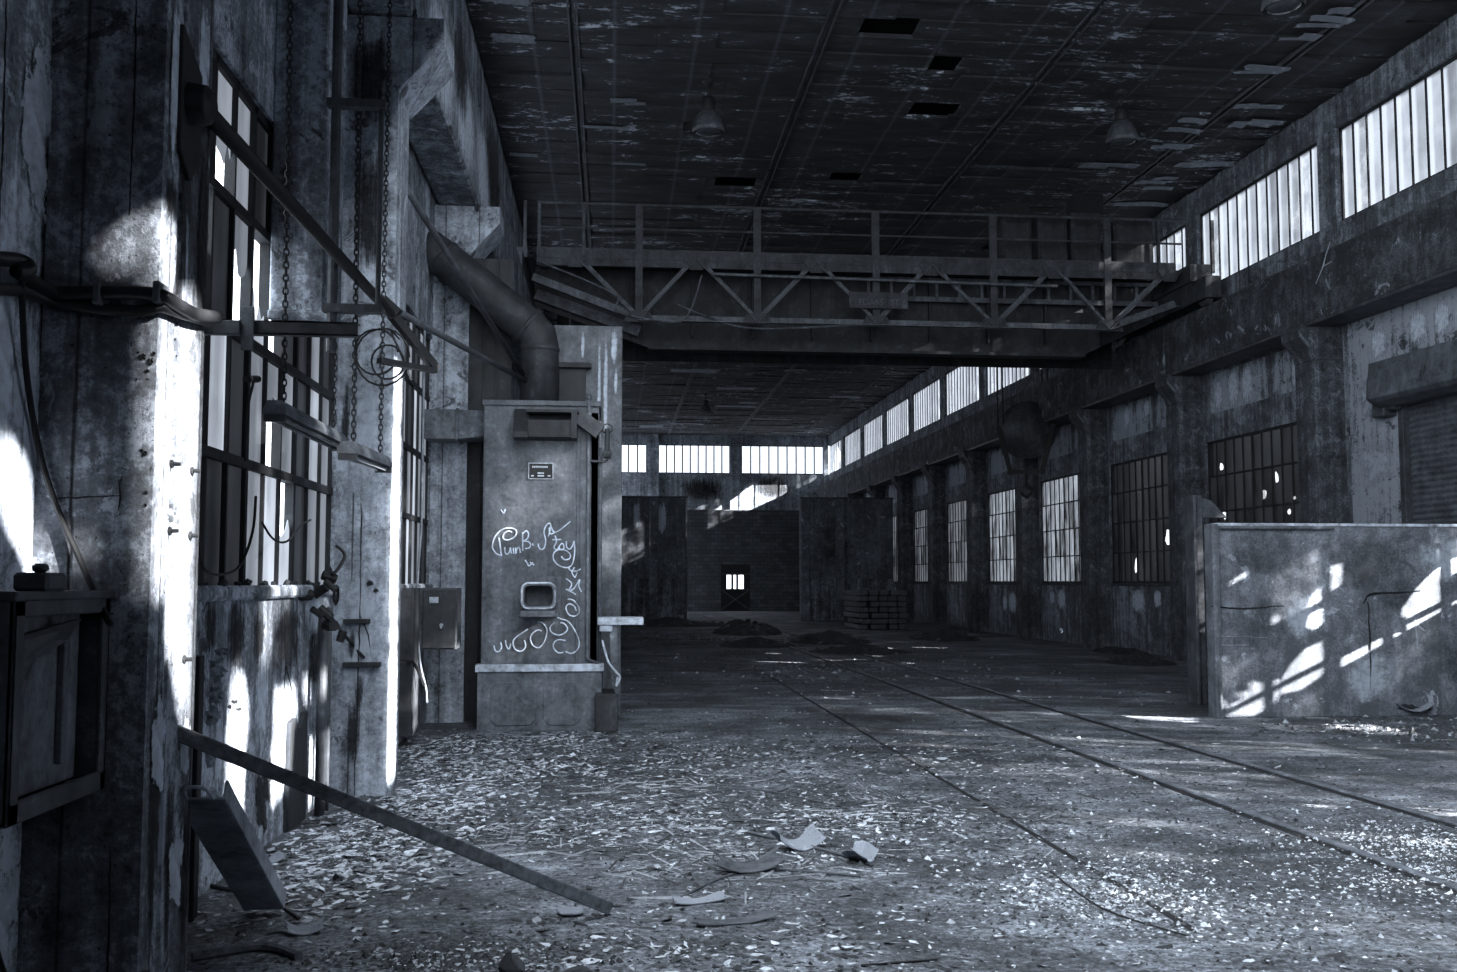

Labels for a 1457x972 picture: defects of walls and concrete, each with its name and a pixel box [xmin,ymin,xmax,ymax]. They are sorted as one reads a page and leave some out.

peeling [491,33,536,44]
water stain [41,138,49,280]
water stain [0,131,43,559]